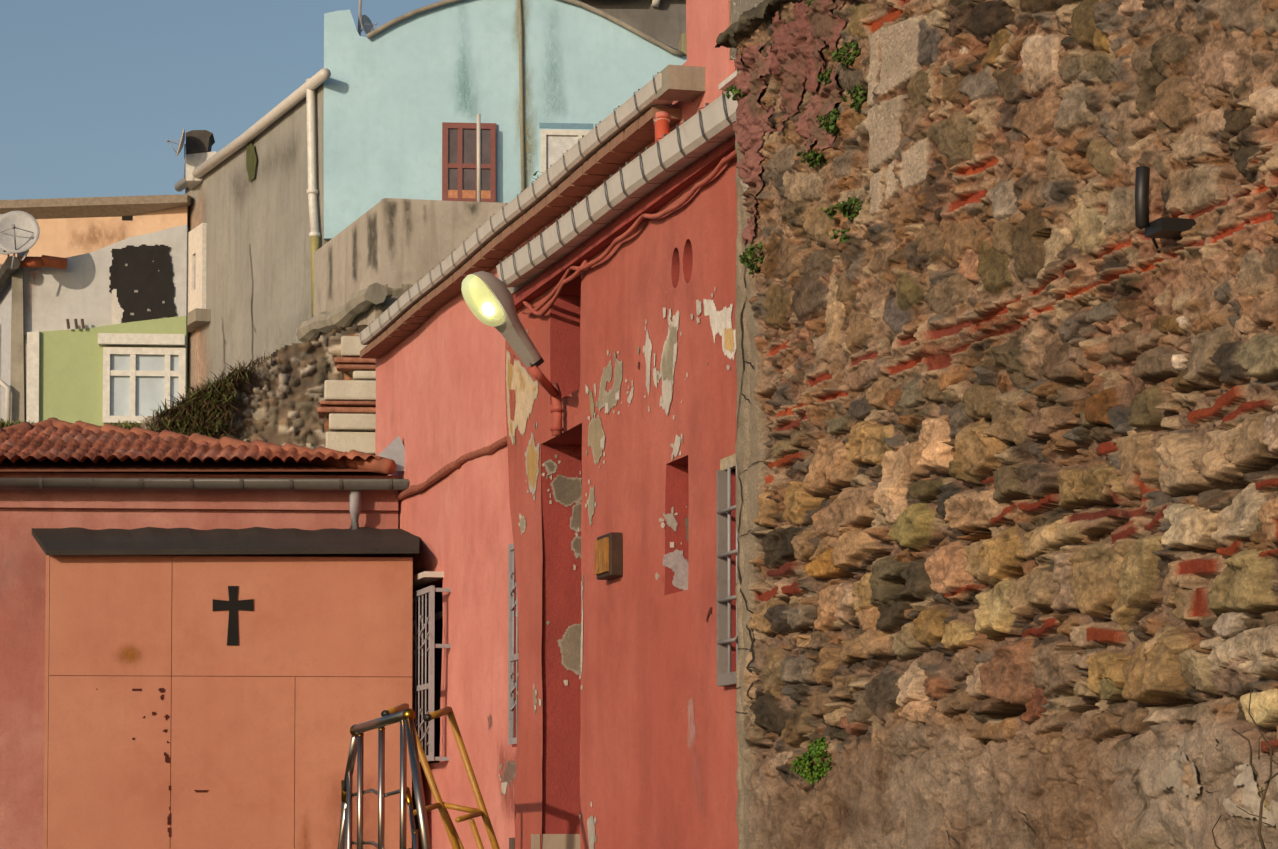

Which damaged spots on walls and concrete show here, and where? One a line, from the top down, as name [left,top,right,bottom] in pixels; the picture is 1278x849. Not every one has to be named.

damp [353,203,409,278]
peeling [585,288,736,468]
peeling [506,345,596,690]
peeling [655,506,689,590]